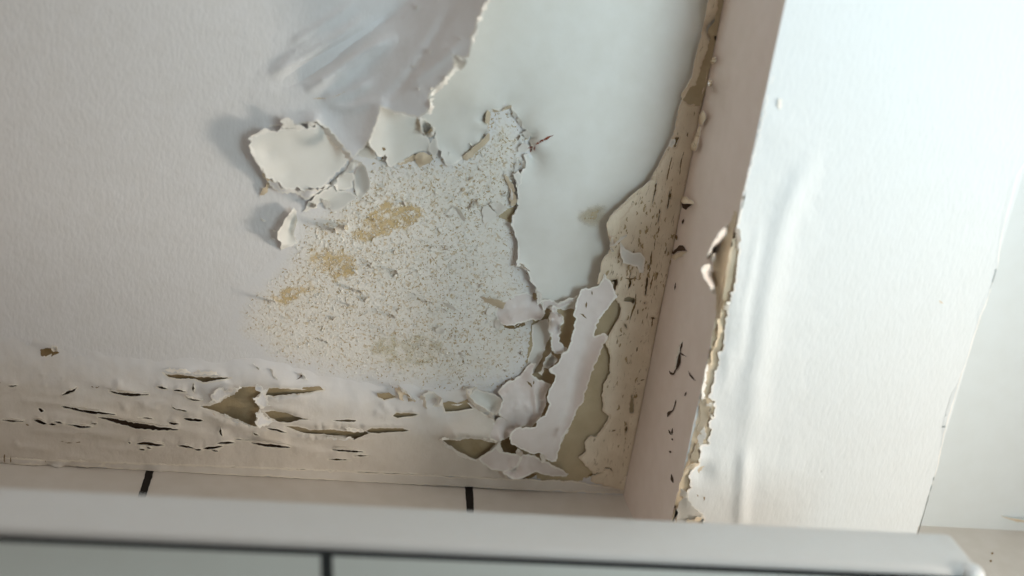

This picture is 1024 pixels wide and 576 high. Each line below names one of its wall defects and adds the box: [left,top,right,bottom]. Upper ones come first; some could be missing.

damp [353,202,421,241]
peeling [228,0,715,481]
flaking render [671,211,739,523]